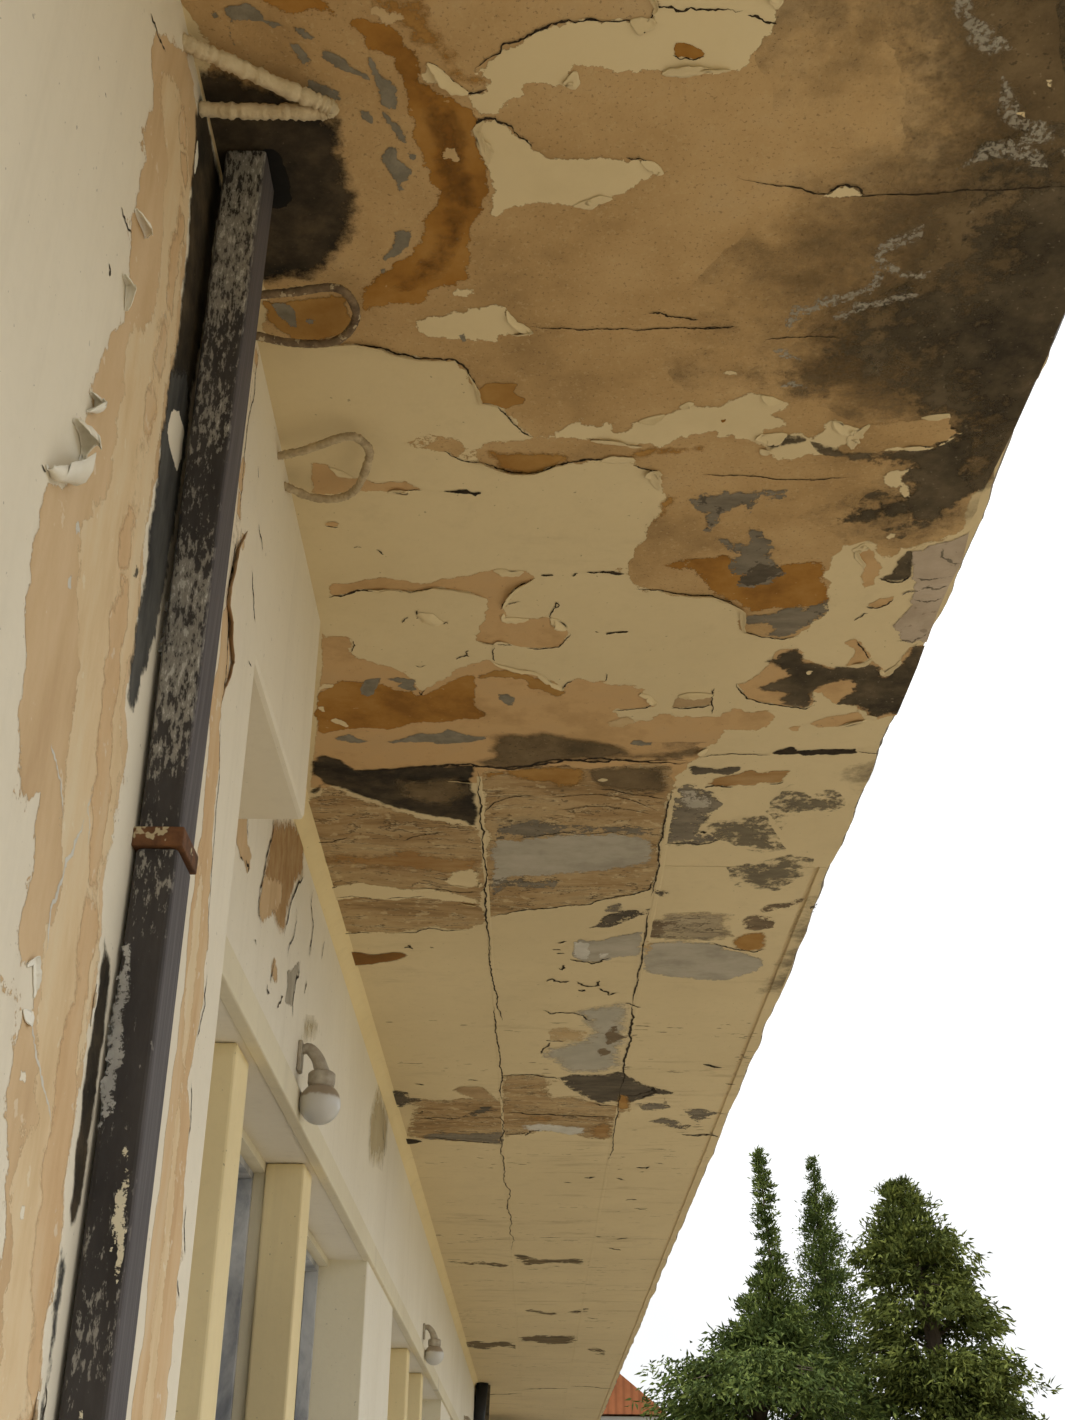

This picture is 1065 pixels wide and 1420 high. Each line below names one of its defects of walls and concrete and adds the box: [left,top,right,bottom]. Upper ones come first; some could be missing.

leakage [128,71,357,708]
leakage [262,0,489,340]
peeling [181,0,1025,640]
crack [742,179,1062,197]
leakage [767,0,1065,539]
leakage [70,951,110,1224]
peeling [0,14,198,1420]
peeling [131,392,255,1420]
crack [473,774,514,1253]
peeling [406,1070,724,1144]
peeling [309,569,880,959]
crack [541,792,720,1250]